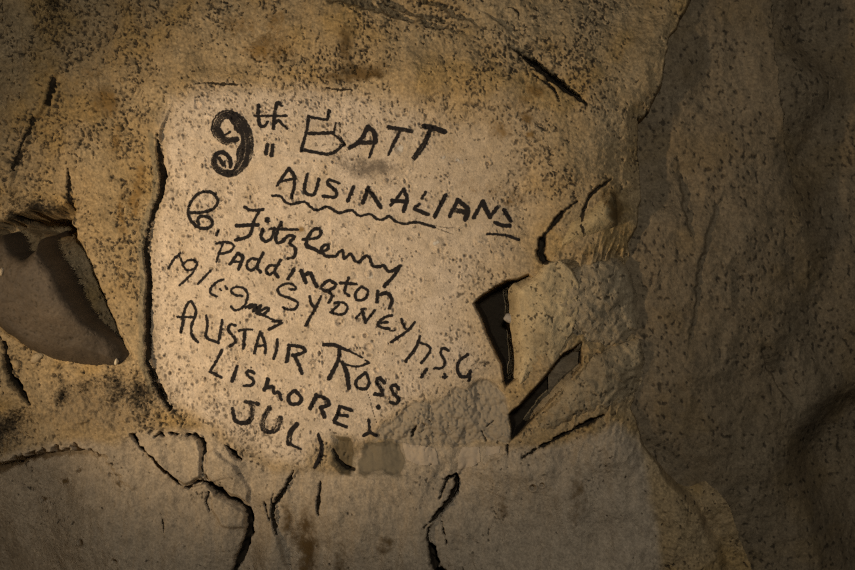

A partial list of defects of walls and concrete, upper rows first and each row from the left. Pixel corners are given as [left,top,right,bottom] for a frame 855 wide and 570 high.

crack [195,79,238,87]
crack [511,48,587,105]
crack [11,77,57,171]
crack [143,134,173,411]
crack [0,336,31,405]
crack [333,449,355,471]
crack [506,415,604,459]
crack [133,432,294,570]
crack [314,481,322,515]
crack [424,473,459,570]